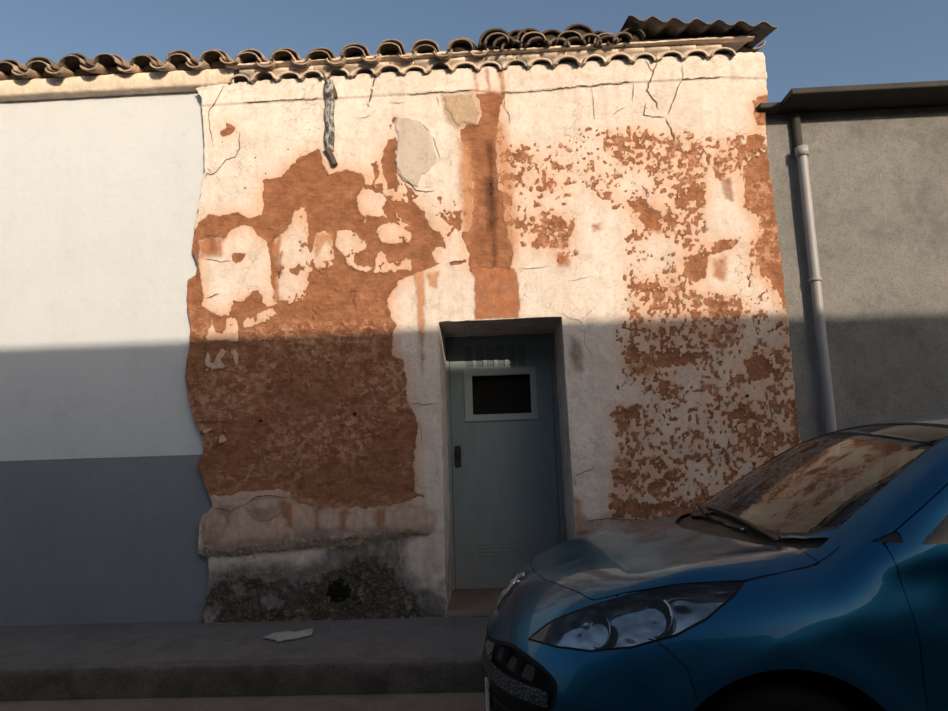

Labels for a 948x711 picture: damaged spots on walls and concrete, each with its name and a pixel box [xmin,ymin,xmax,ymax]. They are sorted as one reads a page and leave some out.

crack [248,96,316,104]
crack [502,61,735,140]
peeling [185,93,806,520]
crack [213,495,284,522]
spalling [201,529,438,623]
leakage [205,539,445,615]